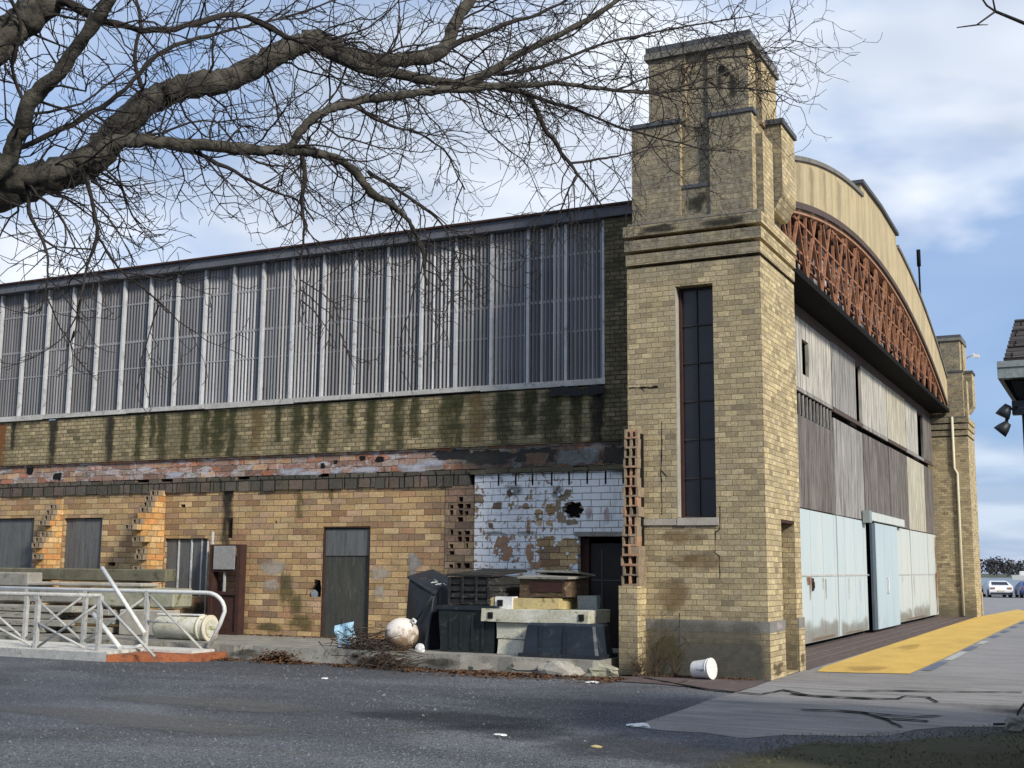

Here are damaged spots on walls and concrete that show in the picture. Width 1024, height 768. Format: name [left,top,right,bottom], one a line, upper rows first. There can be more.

water stain [49,421,57,463]
water stain [106,417,114,461]
water stain [134,414,166,460]
water stain [181,413,190,458]
water stain [201,410,236,457]
water stain [275,404,331,454]
water stain [347,400,376,451]
water stain [393,399,420,448]
water stain [439,396,464,447]
water stain [495,389,605,443]
peeling [557,447,600,466]
peeling [474,489,583,571]